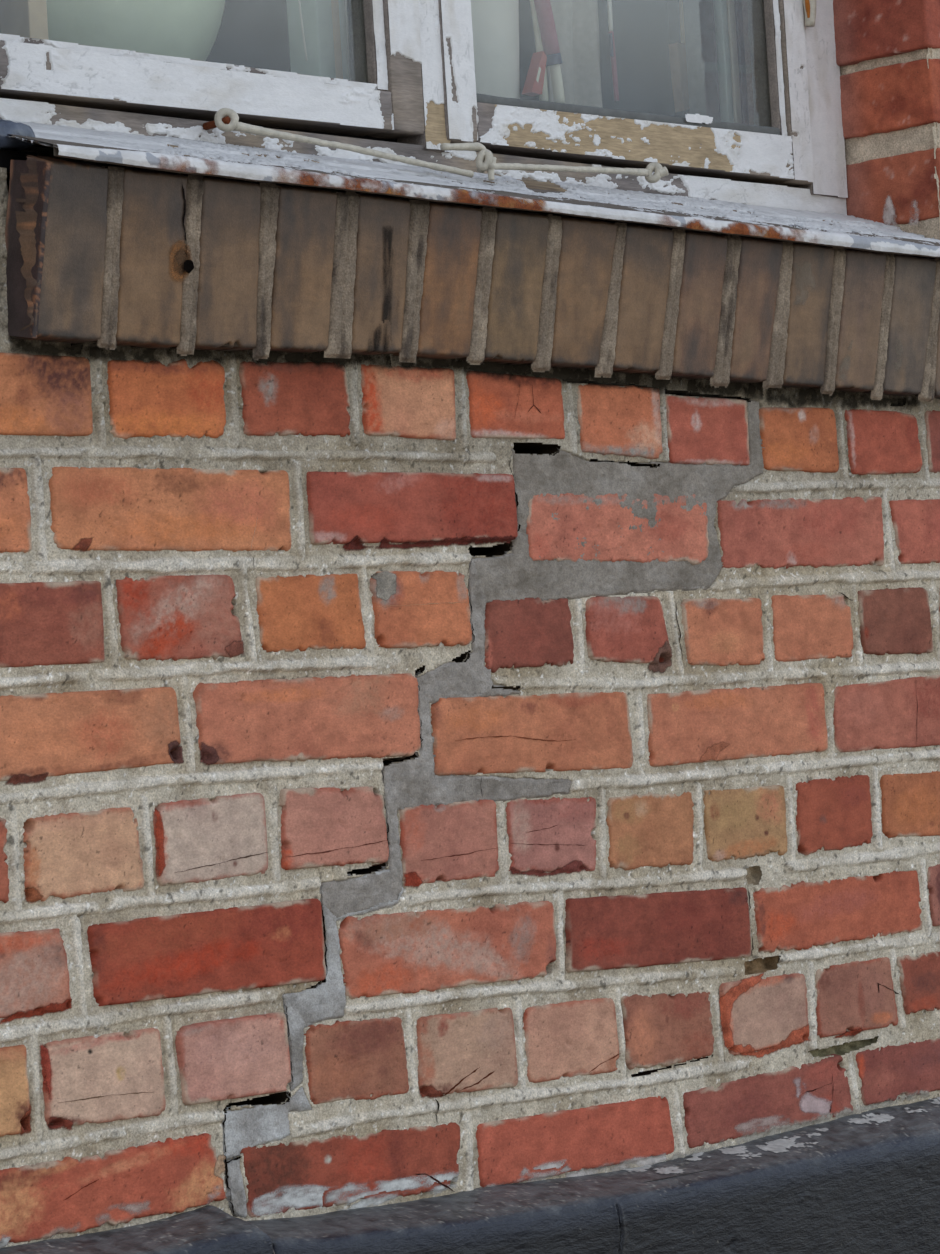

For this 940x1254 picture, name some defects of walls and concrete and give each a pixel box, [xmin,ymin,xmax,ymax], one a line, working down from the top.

peeling [425,101,451,146]
peeling [503,109,741,172]
crack [589,459,660,468]
crack [175,386,584,875]
crack [222,905,328,1217]
crack [436,1067,494,1123]
crack [416,1173,455,1192]